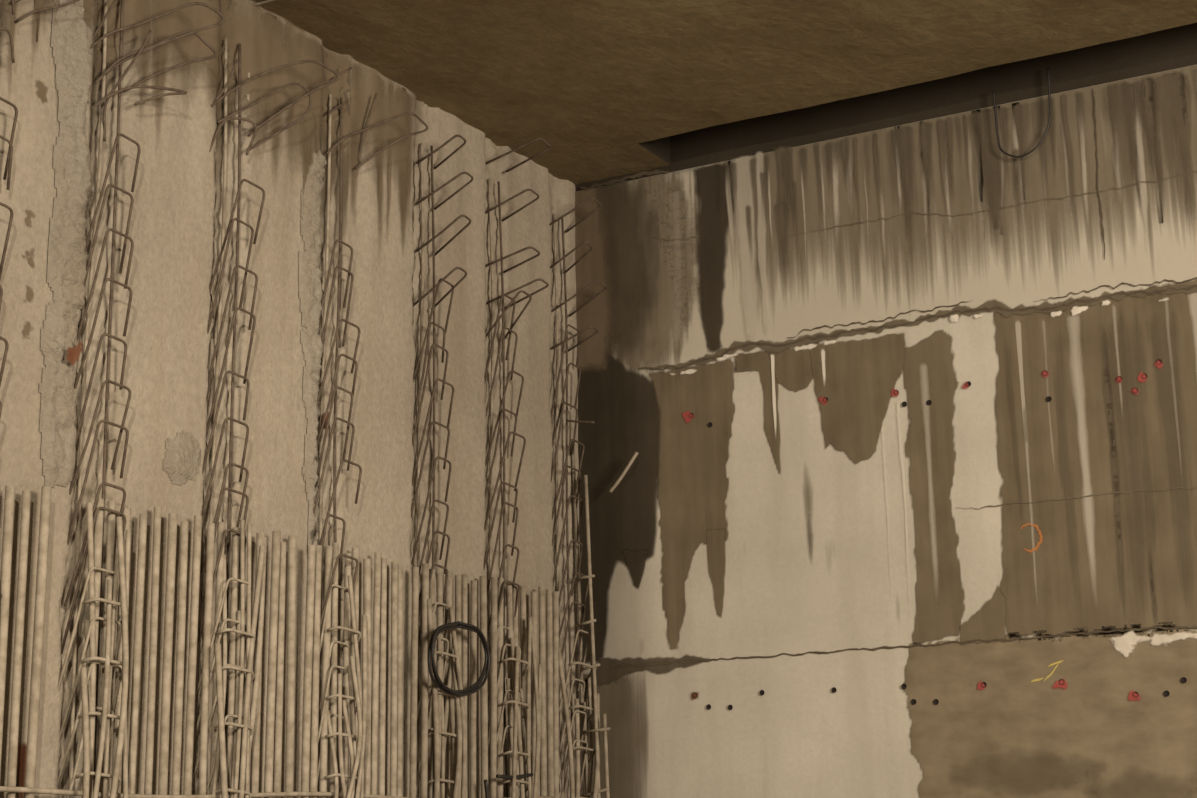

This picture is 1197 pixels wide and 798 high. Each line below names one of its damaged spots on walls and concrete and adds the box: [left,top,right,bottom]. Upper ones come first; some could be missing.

spalling [0,0,94,798]
spalling [93,149,559,798]
spalling [570,439,610,798]
leakage [575,65,1197,798]
crack [596,626,1197,685]
crack [639,89,1197,370]